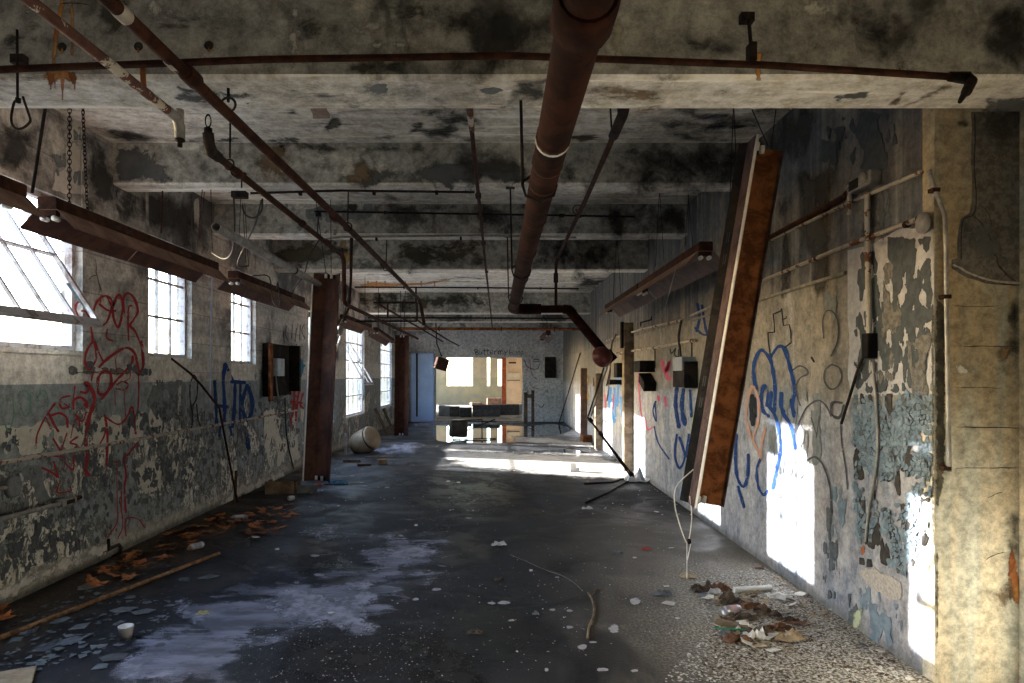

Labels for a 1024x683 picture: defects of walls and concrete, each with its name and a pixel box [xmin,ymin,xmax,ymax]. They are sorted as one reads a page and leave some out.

corrosion [44,0,77,100]
leakage [591,75,671,111]
leakage [834,92,869,101]
leakage [85,130,208,250]
leakage [346,135,398,187]
leakage [388,204,522,274]
leakage [411,108,527,191]
leakage [538,108,815,290]
leakage [779,165,834,298]
leakage [360,293,487,311]
peeling [0,361,304,581]
peeling [823,227,935,645]